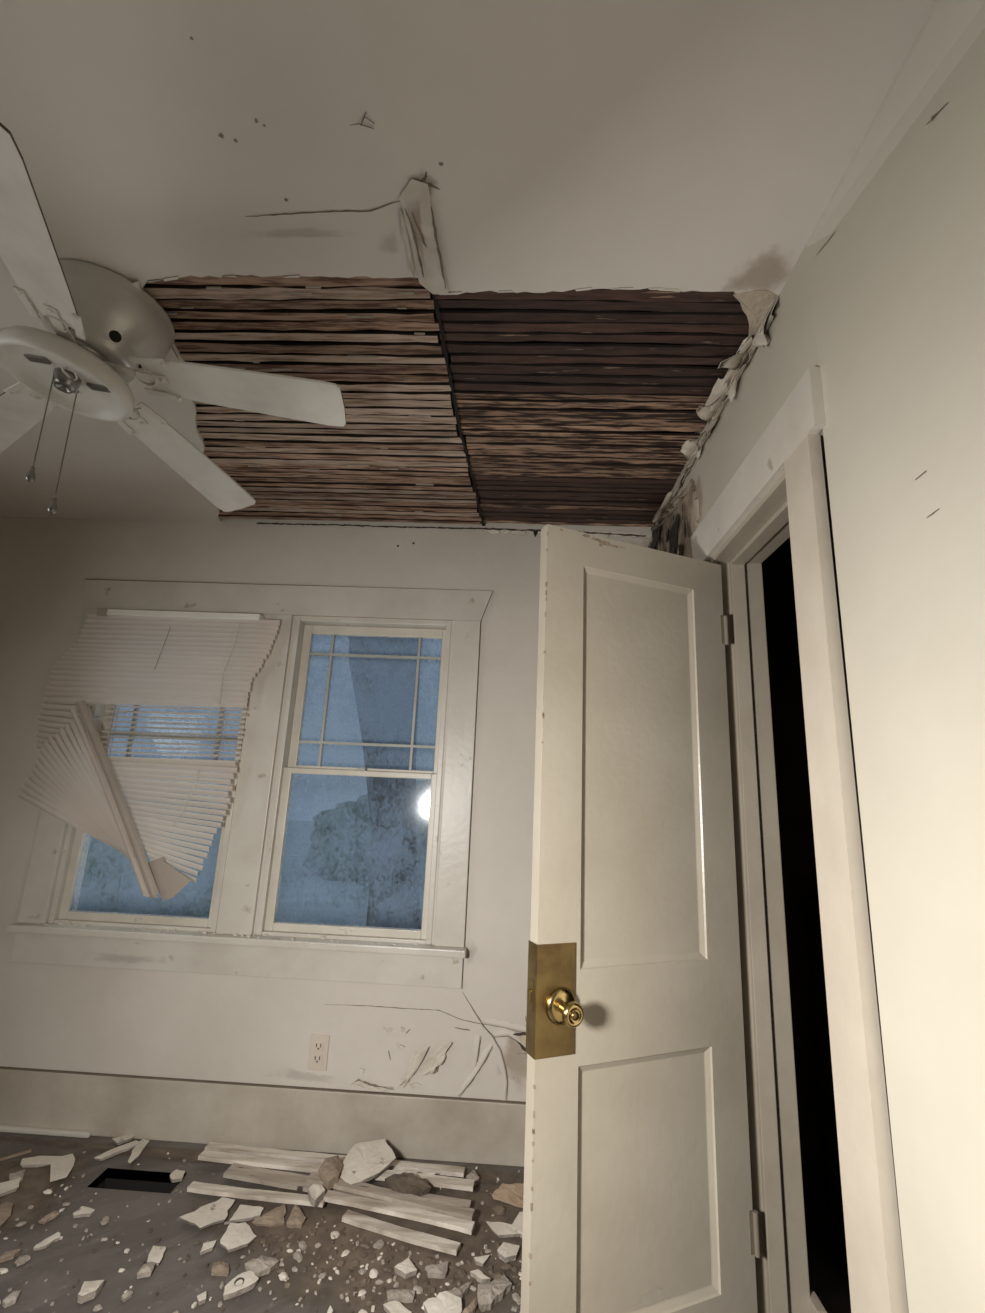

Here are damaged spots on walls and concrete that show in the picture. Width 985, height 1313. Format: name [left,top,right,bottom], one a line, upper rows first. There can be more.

crack [245,171,440,217]
peeling [580,296,779,558]
spalling [256,522,563,551]
crack [324,992,526,1101]